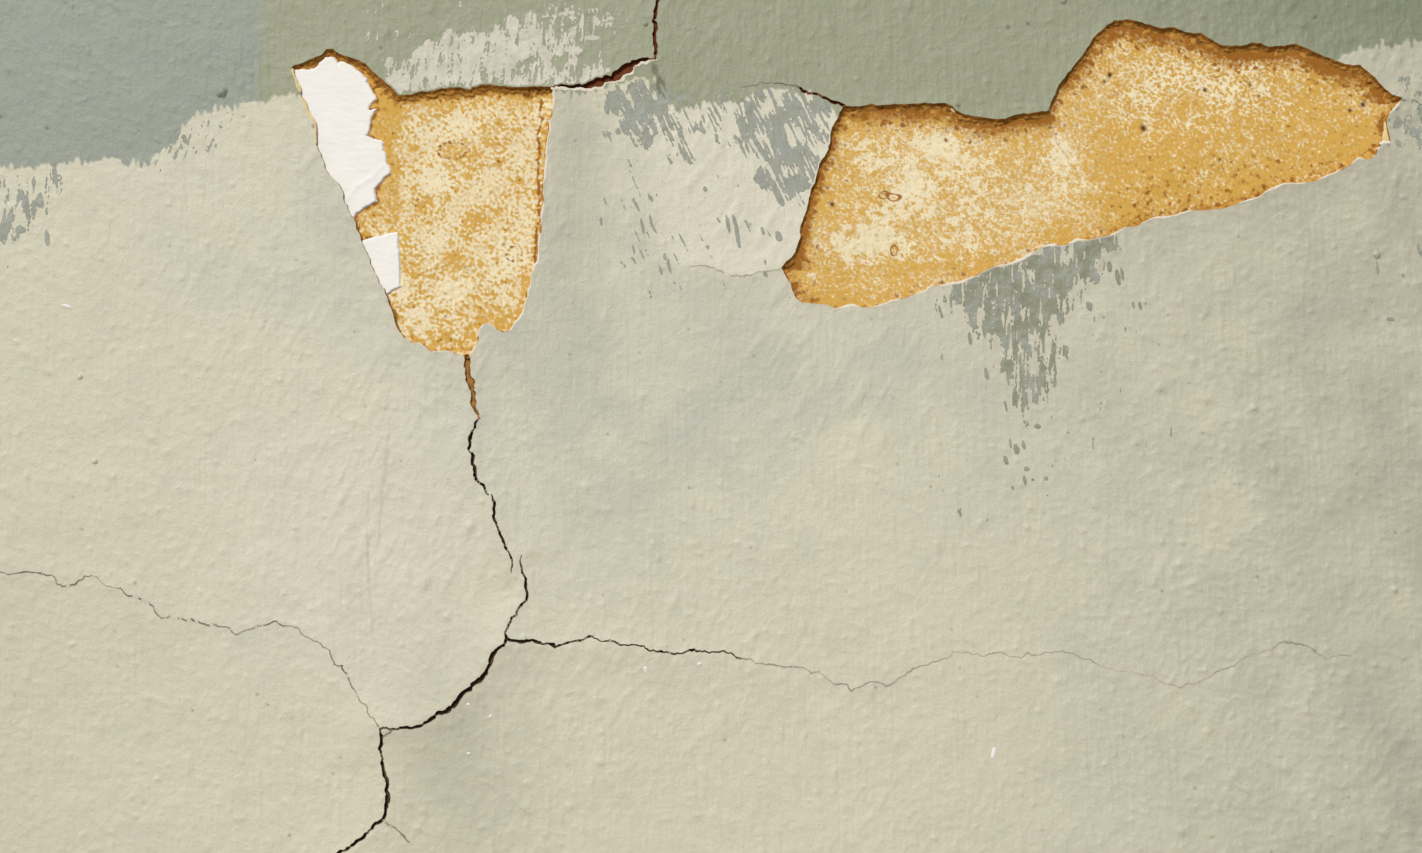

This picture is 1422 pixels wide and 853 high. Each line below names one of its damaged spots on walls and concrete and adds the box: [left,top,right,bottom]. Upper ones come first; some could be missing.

crack [551,0,659,92]
crack [740,82,846,107]
peeling [291,0,1422,496]
crack [0,354,1351,853]